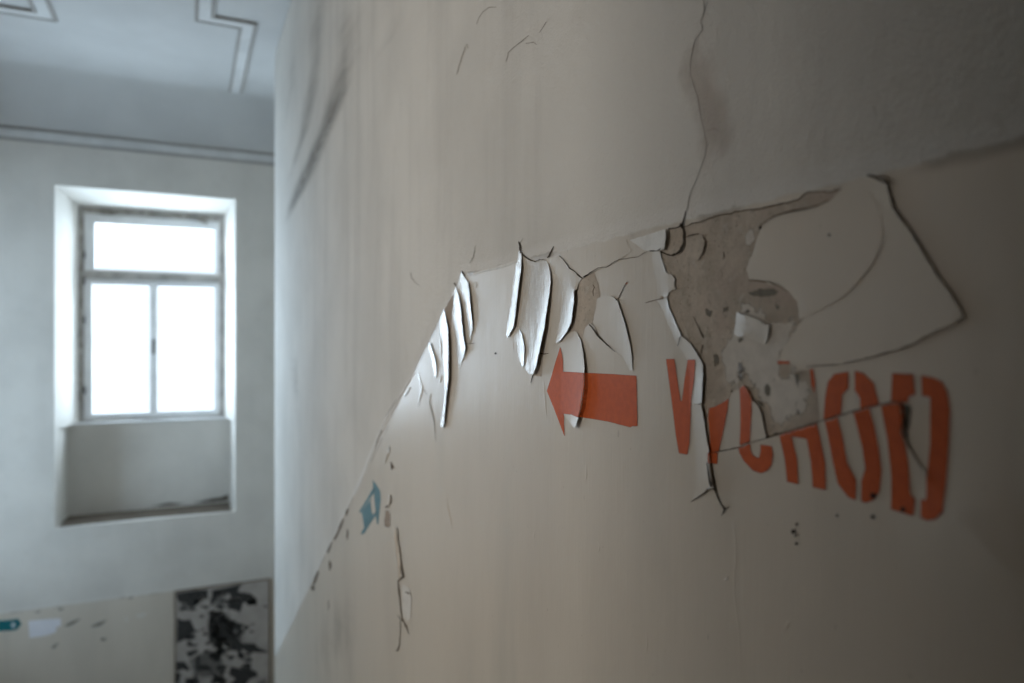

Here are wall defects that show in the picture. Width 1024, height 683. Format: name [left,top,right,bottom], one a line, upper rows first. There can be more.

crack [650,0,718,256]
flaking render [353,189,841,500]
peeling [311,509,349,591]
crack [384,445,411,651]
crack [691,401,896,683]